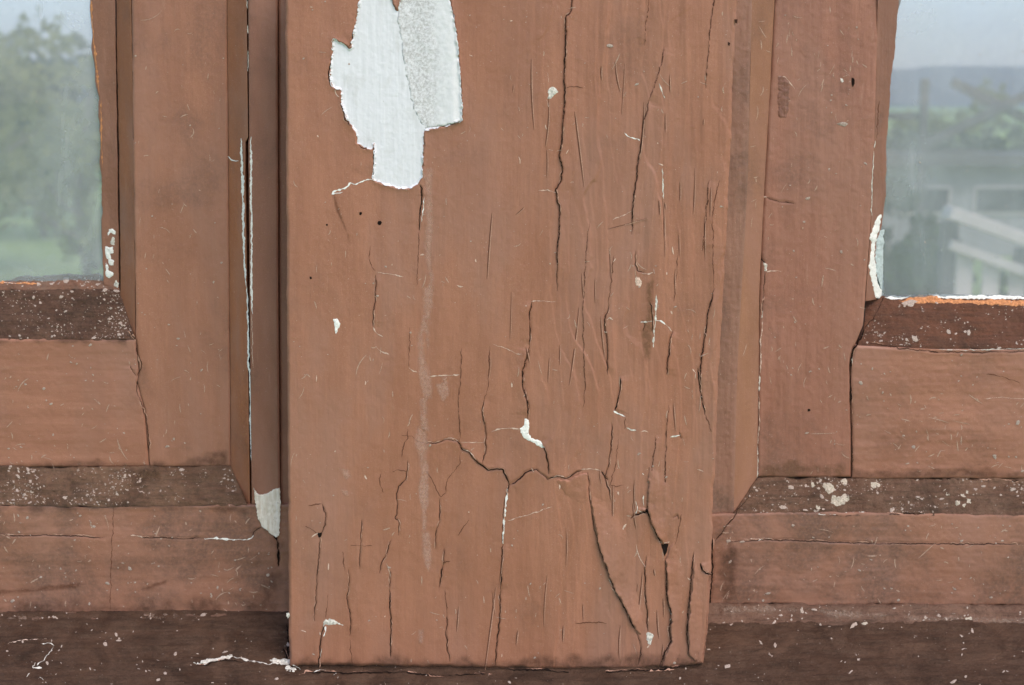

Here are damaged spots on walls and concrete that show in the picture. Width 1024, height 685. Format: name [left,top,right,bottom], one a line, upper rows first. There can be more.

peeling [328,0,463,196]
peeling [105,229,119,288]
peeling [868,101,911,299]
crack [128,329,151,464]
peeling [520,419,543,448]
crack [283,0,1024,677]
peeling [254,488,281,537]